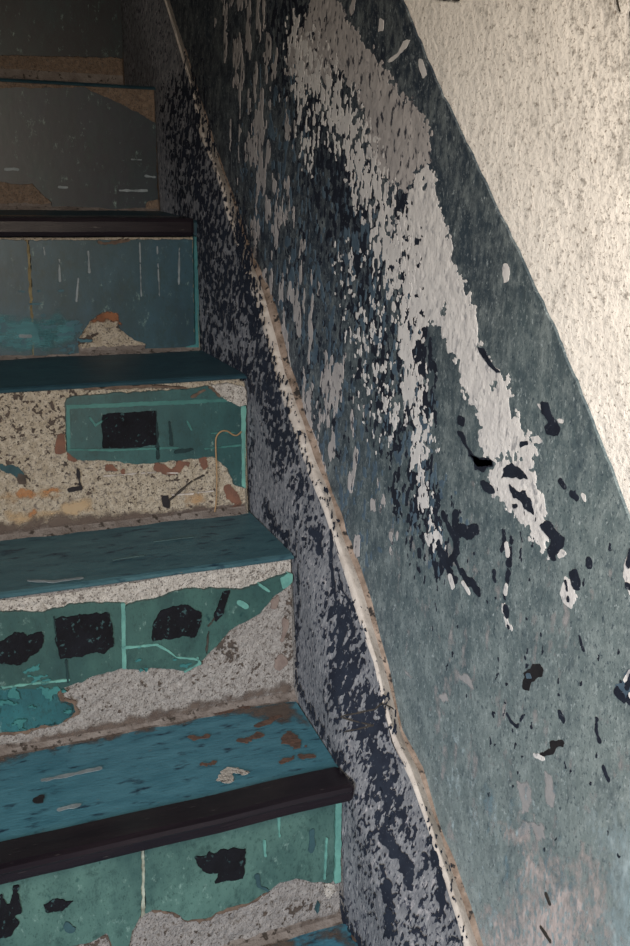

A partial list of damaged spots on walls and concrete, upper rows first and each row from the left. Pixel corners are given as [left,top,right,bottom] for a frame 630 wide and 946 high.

peeling [0,0,567,612]
peeling [558,478,586,502]
peeling [495,529,514,631]
peeling [560,556,593,625]
spalling [0,468,449,946]
peeling [435,625,475,731]
peeling [522,632,544,691]
peeling [470,702,607,946]
peeling [442,916,468,946]